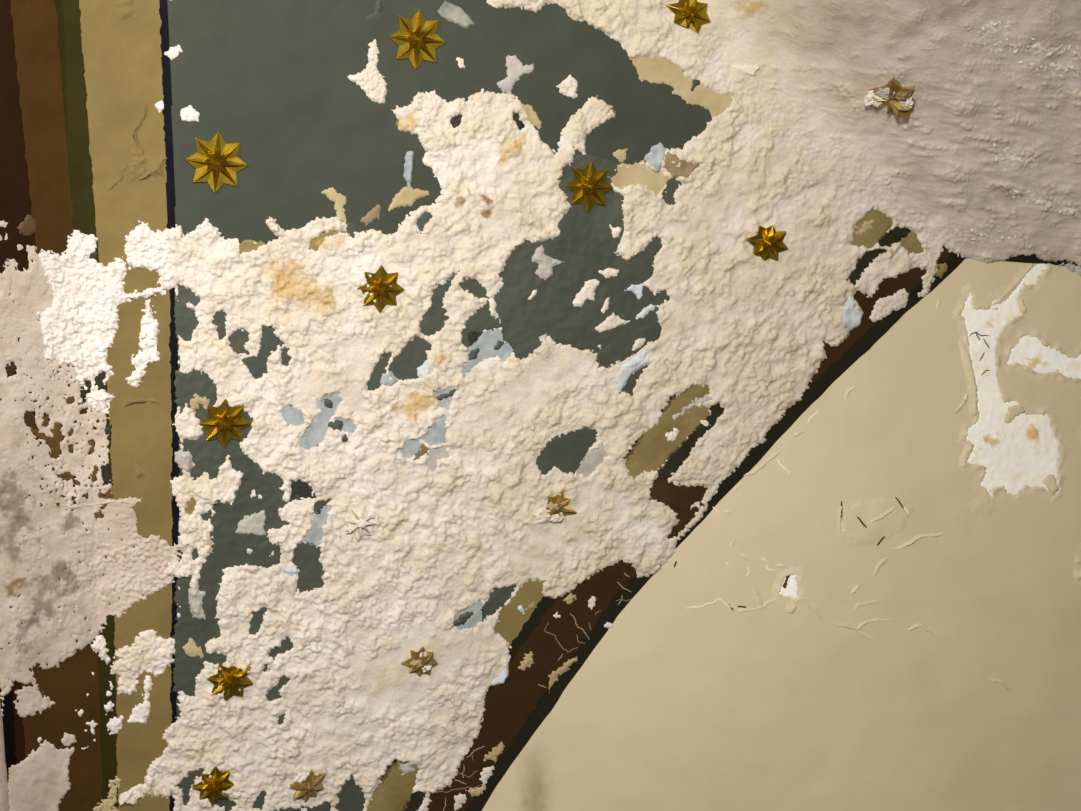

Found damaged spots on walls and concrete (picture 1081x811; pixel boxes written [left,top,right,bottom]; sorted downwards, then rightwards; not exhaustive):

peeling [438,1,475,29]
flaking render [348,39,387,104]
flaking render [17,214,36,236]
flaking render [0,245,290,717]
flaking render [119,55,948,811]
flaking render [952,263,1081,512]
flaking render [8,709,98,811]
flaking render [93,776,121,811]